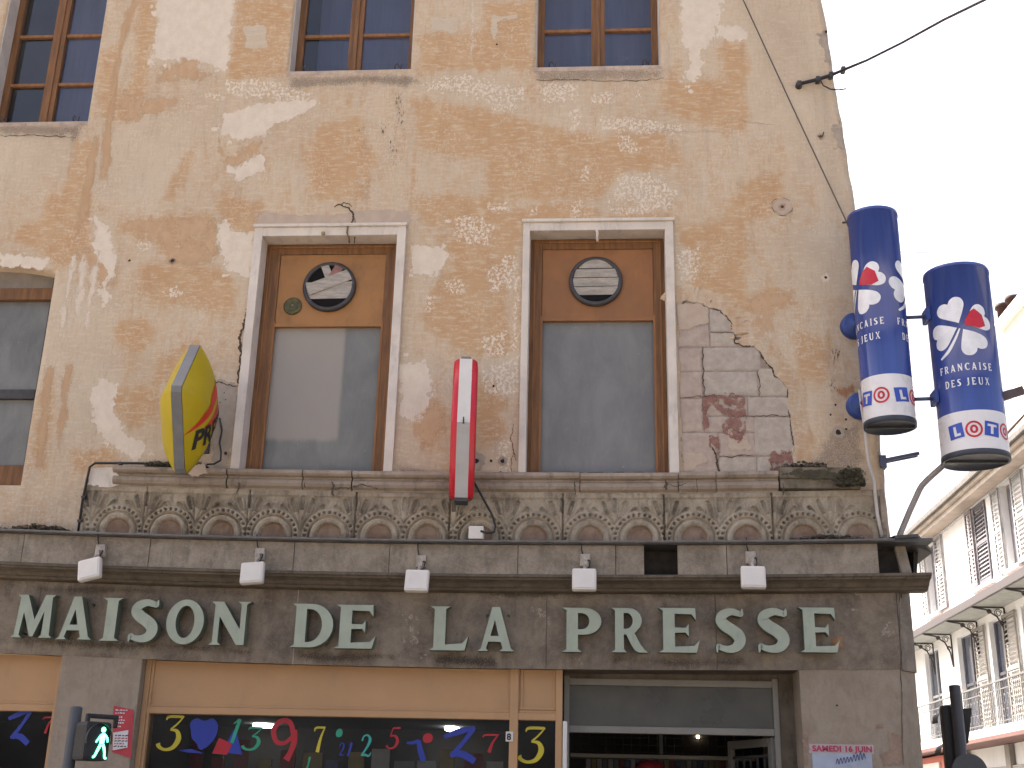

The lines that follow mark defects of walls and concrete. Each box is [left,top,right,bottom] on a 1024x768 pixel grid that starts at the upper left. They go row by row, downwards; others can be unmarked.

peeling [147,0,320,183]
peeling [677,0,748,95]
peeling [88,214,118,308]
crack [334,202,355,243]
peeling [409,200,513,312]
crack [216,312,246,387]
flaking render [660,246,814,472]
peeling [87,377,157,462]
crack [331,481,378,496]
crack [664,479,698,493]